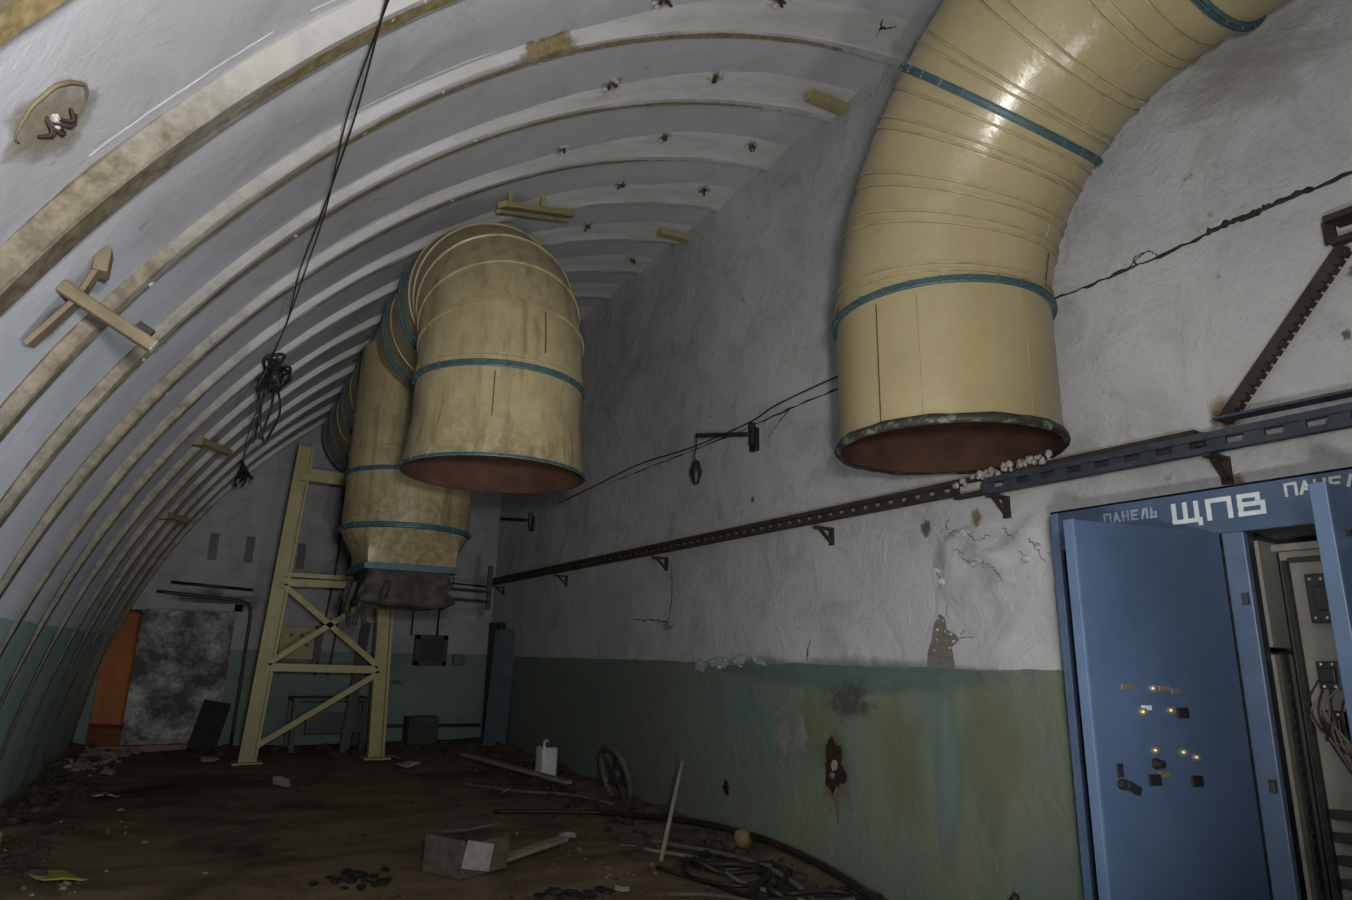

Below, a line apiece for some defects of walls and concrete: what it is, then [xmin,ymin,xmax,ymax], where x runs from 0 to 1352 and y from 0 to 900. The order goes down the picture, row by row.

crack [1055,171,1352,299]
peeling [695,606,979,689]
spalling [824,736,847,823]